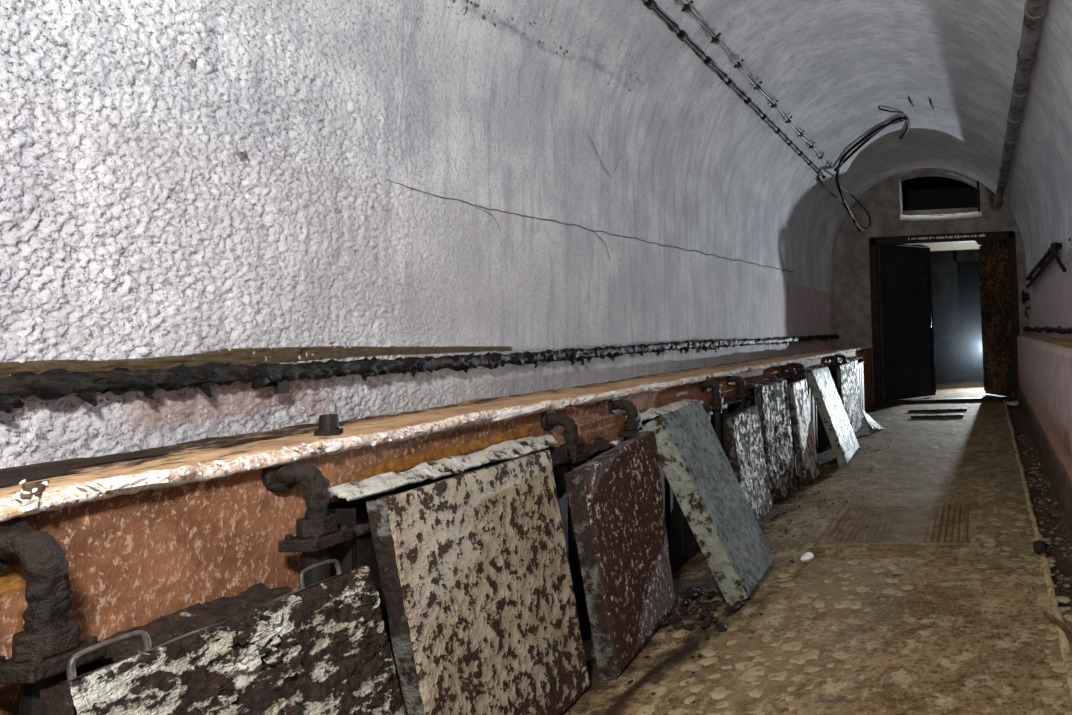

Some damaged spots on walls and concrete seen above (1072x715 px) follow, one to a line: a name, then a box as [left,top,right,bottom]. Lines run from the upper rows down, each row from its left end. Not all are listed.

crack [386,0,794,273]
peeling [758,346,872,368]
peeling [641,369,745,391]
peeling [487,391,628,421]
peeling [371,423,434,446]
peeling [283,441,342,460]
peeling [11,479,67,512]
peeling [75,471,185,496]
corrosion [0,565,26,595]